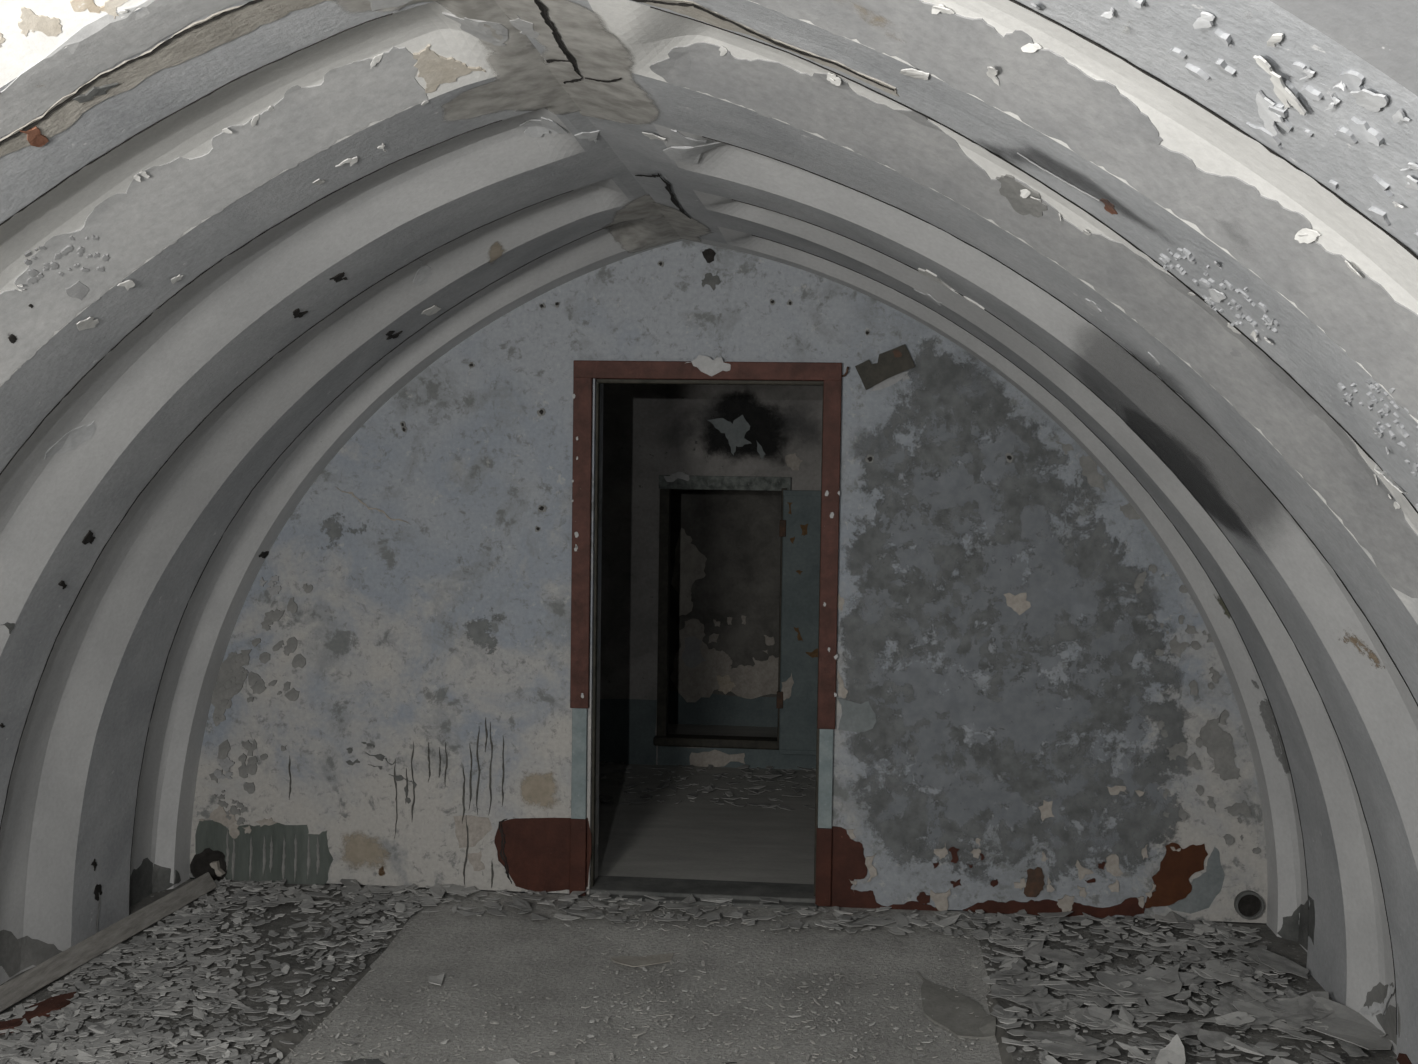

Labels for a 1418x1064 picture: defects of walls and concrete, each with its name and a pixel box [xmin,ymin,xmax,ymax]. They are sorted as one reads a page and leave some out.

crack [0,0,263,145]
peeling [0,0,335,157]
crack [534,0,621,84]
crack [632,0,894,91]
peeling [0,44,486,385]
crack [635,173,691,219]
peeling [642,0,1418,598]
spalling [82,530,95,545]
peeling [1251,680,1290,774]
spalling [1157,710,1261,854]
peeling [917,838,985,911]
peeling [990,851,1123,912]